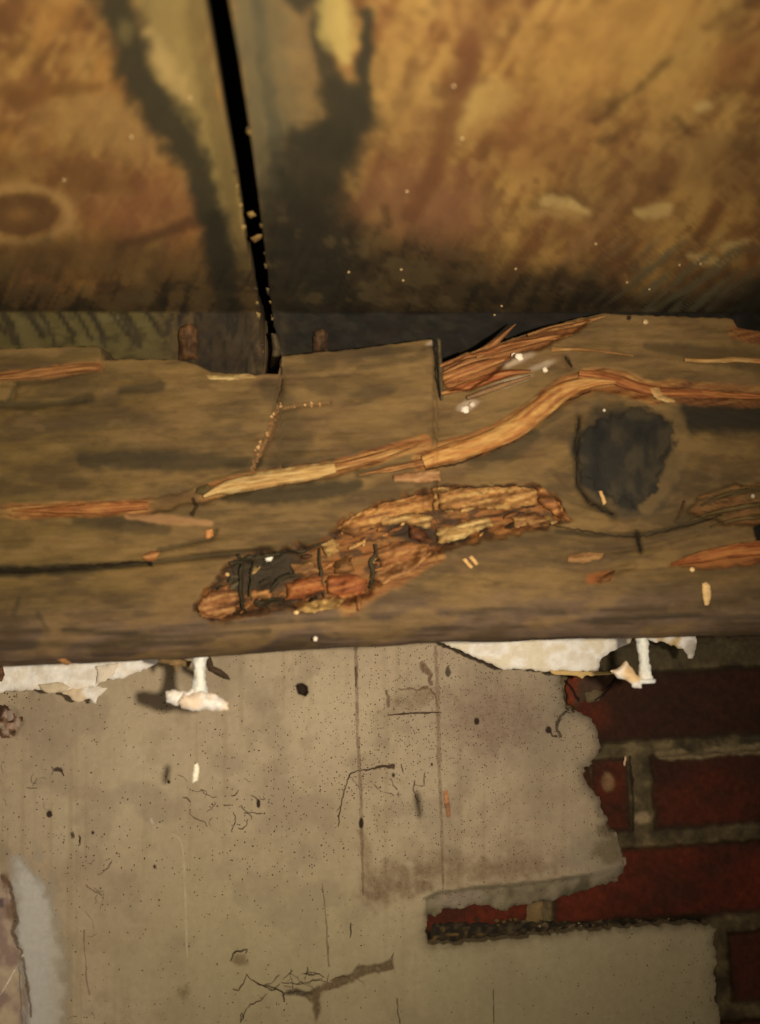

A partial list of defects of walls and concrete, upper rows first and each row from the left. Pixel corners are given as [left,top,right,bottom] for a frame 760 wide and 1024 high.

crack [432,340,440,397]
crack [250,360,329,472]
crack [426,439,517,470]
crack [546,391,721,551]
peeling [39,663,119,703]
spalling [550,670,616,709]
crack [338,764,415,825]
crack [230,950,393,1022]